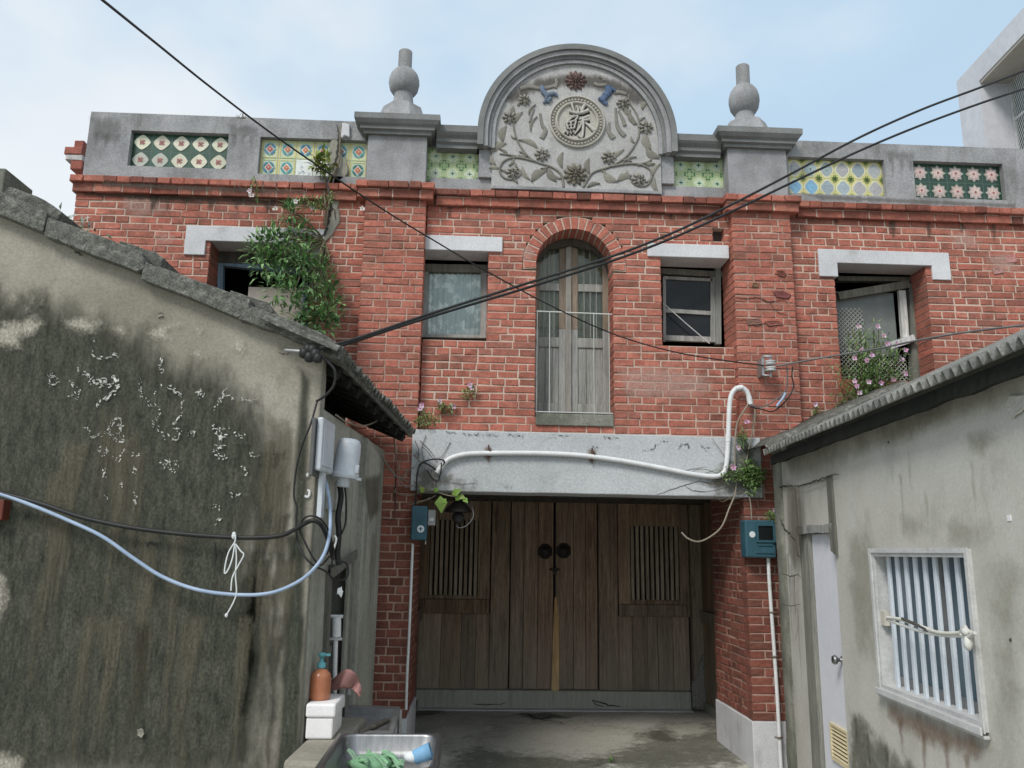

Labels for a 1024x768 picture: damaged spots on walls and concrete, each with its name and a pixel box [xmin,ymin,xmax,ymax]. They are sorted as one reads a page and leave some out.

leakage [39,444,87,604]
peeling [47,367,120,406]
peeling [83,417,140,478]
leakage [104,431,154,697]
peeling [139,357,196,441]
peeling [212,424,245,460]
leakage [236,435,303,758]
crack [780,518,802,637]
crack [779,473,839,488]
leakage [76,618,124,716]